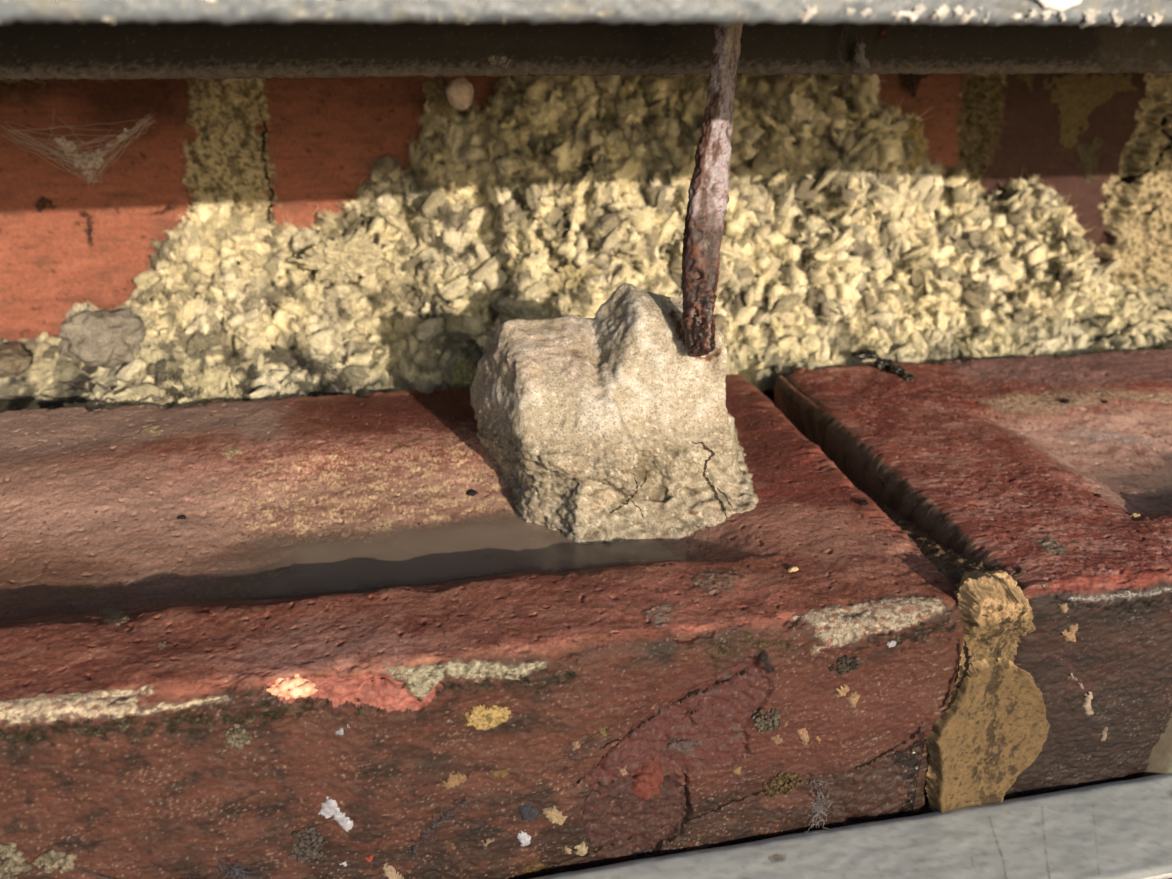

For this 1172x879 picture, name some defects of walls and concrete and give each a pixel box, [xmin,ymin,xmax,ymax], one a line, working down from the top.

peeling [1038,0,1082,12]
corrosion [670,310,686,345]
crack [610,472,647,518]
crack [692,442,733,518]
spalling [265,674,444,713]
crack [576,654,760,784]
crack [554,773,808,865]